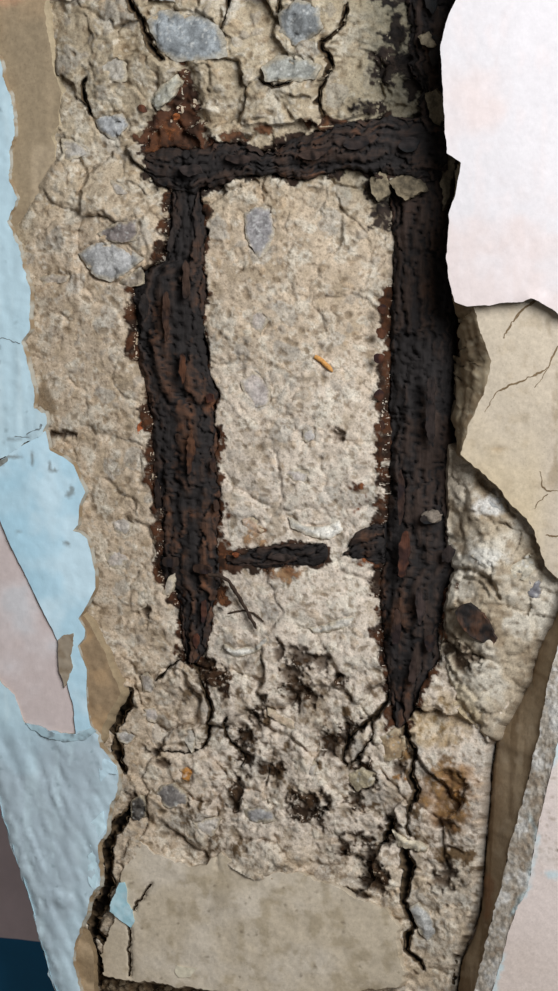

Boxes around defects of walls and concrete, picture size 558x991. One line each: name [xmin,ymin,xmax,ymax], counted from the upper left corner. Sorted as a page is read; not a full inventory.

flaking render [0,0,66,226]
rust [132,60,395,276]
crack [314,3,348,117]
rust [367,0,424,103]
peeling [425,0,558,580]
peeling [0,429,99,733]
rust [136,289,332,699]
rust [349,286,411,577]
peeling [0,522,135,991]
crack [87,806,152,991]
crack [110,691,134,773]
crack [378,723,424,970]